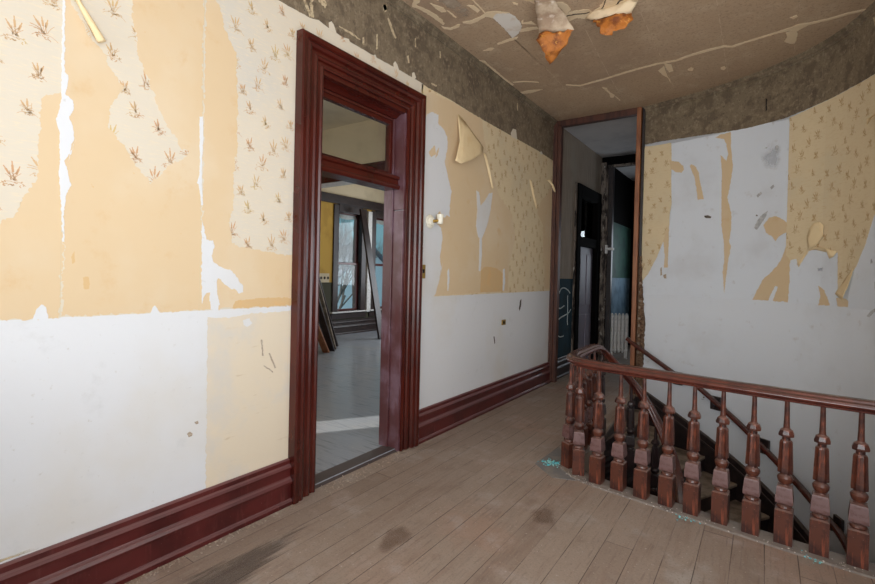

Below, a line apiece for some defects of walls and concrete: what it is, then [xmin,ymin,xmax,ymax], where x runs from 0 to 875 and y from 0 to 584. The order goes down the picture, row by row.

peeling [412,0,538,51]
peeling [556,0,638,21]
flaking render [56,0,74,242]
flaking render [201,223,243,310]
flaking render [422,112,452,298]
flaking render [476,190,493,271]
flaking render [635,120,838,397]
flaking render [847,215,875,311]
flaking render [32,304,49,320]